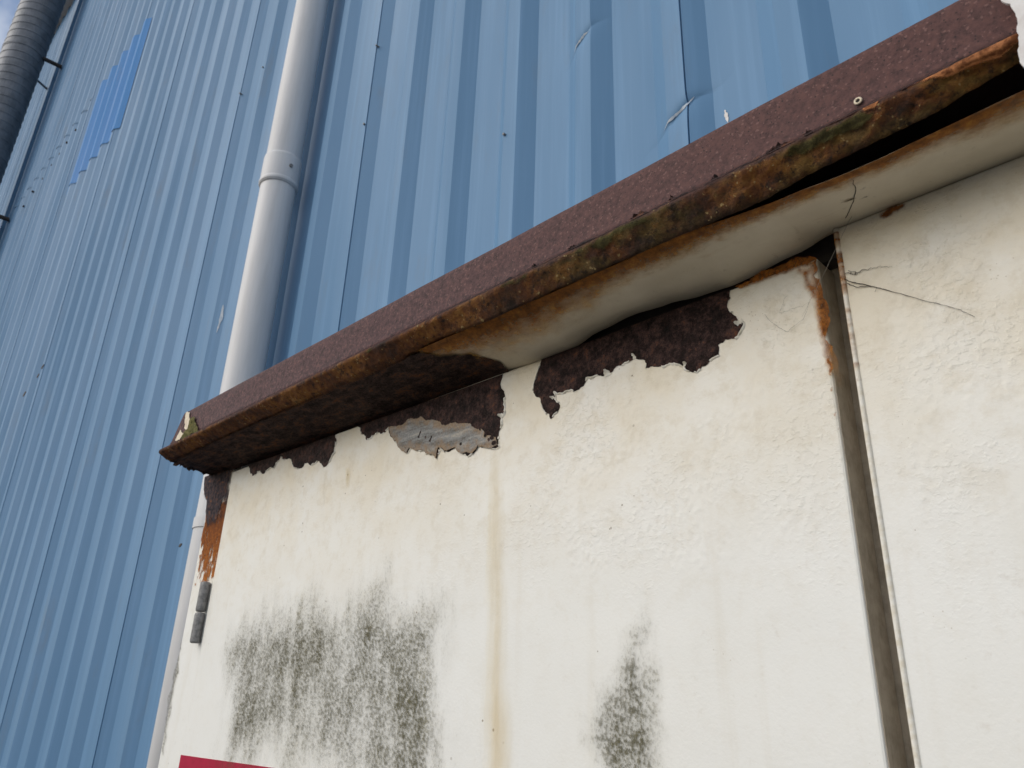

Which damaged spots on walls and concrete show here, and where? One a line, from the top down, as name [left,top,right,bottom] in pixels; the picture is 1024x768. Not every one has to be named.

corrosion [923,33,1019,80]
corrosion [170,90,1024,585]